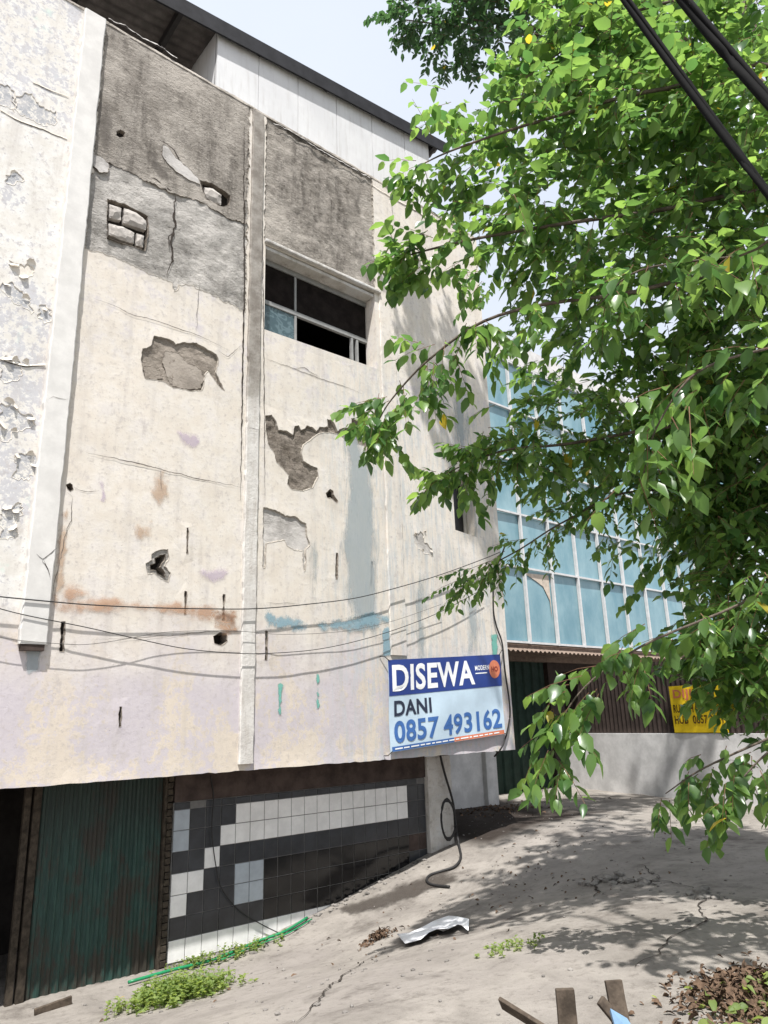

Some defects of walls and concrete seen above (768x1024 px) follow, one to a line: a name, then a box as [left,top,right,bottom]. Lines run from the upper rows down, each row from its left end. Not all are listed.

spalling [85,24,251,312]
crack [89,126,362,501]
spalling [141,336,225,391]
peeling [0,397,36,442]
spalling [265,414,367,491]
peeling [0,502,24,540]
spalling [146,549,171,583]
spalling [262,507,310,572]
water stain [319,437,391,656]
rust [66,589,119,611]
rust [157,603,237,633]
water stain [266,613,303,630]